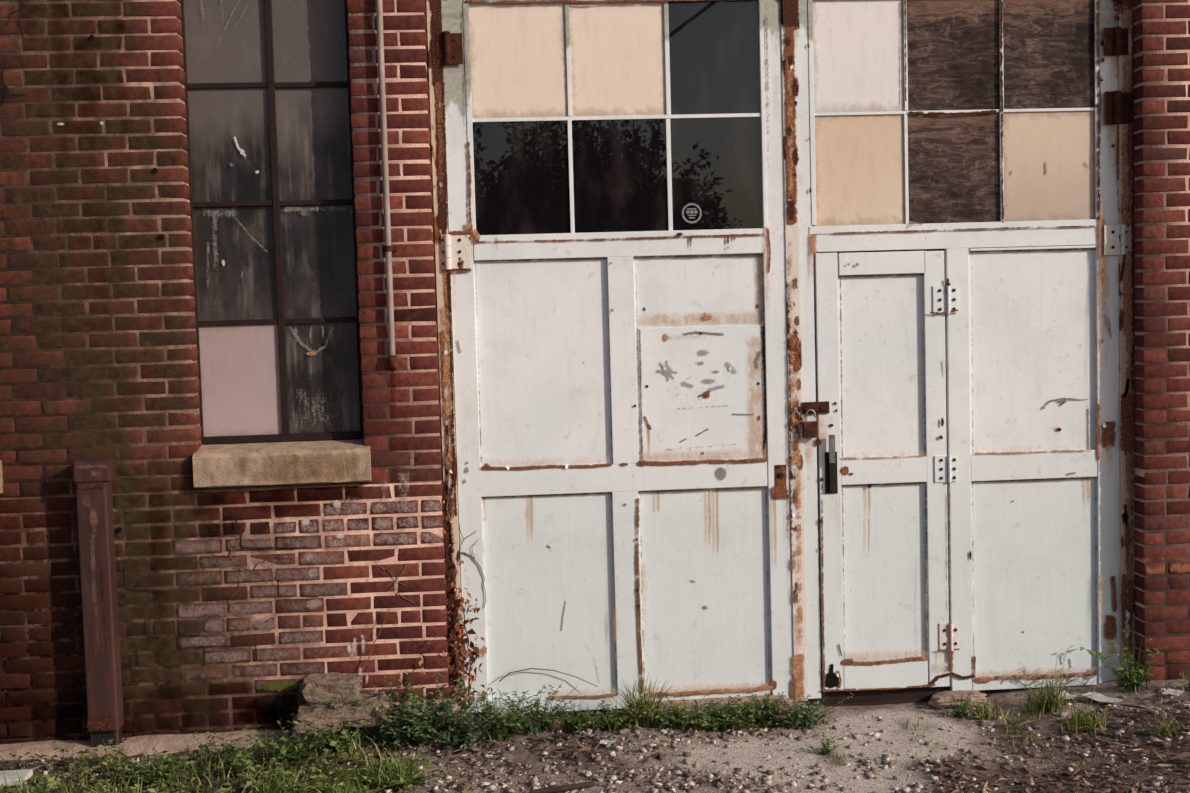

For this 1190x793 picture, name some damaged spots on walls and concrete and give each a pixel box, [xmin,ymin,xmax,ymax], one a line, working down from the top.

rust [764,0,811,225]
water stain [0,0,189,598]
water stain [177,474,440,725]
rust [440,269,471,705]
rust [430,0,771,471]
peeling [634,329,652,459]
peeling [656,350,736,408]
rust [635,498,777,697]
rust [772,438,821,504]
rust [792,654,805,700]
rust [819,0,1135,692]